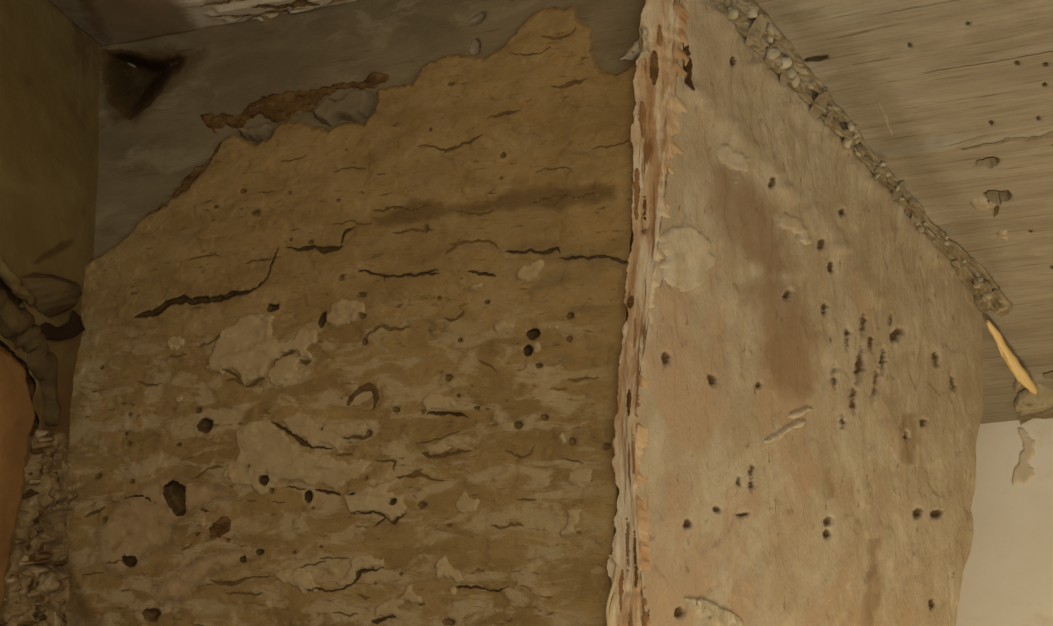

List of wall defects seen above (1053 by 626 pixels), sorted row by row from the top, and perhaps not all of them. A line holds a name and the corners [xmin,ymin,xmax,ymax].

crack [512,27,577,56]
crack [551,78,587,88]
flaking render [717,145,750,172]
crack [357,209,628,282]
crack [134,205,432,318]
crack [366,323,410,339]
spalling [93,0,716,626]
crack [444,310,464,321]
crack [224,350,311,387]
crack [567,375,599,383]
flaking render [1012,408,1053,486]
crack [491,498,537,529]